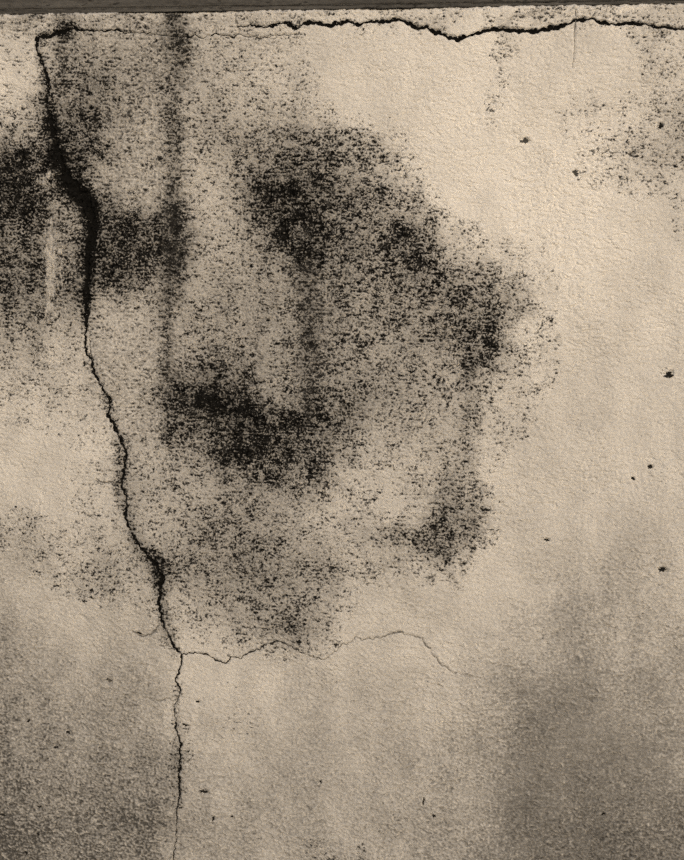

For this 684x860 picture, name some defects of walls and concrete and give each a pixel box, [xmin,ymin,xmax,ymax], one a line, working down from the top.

crack [35,27,469,860]
damp [0,12,559,661]
crack [158,9,684,68]
damp [555,27,684,209]